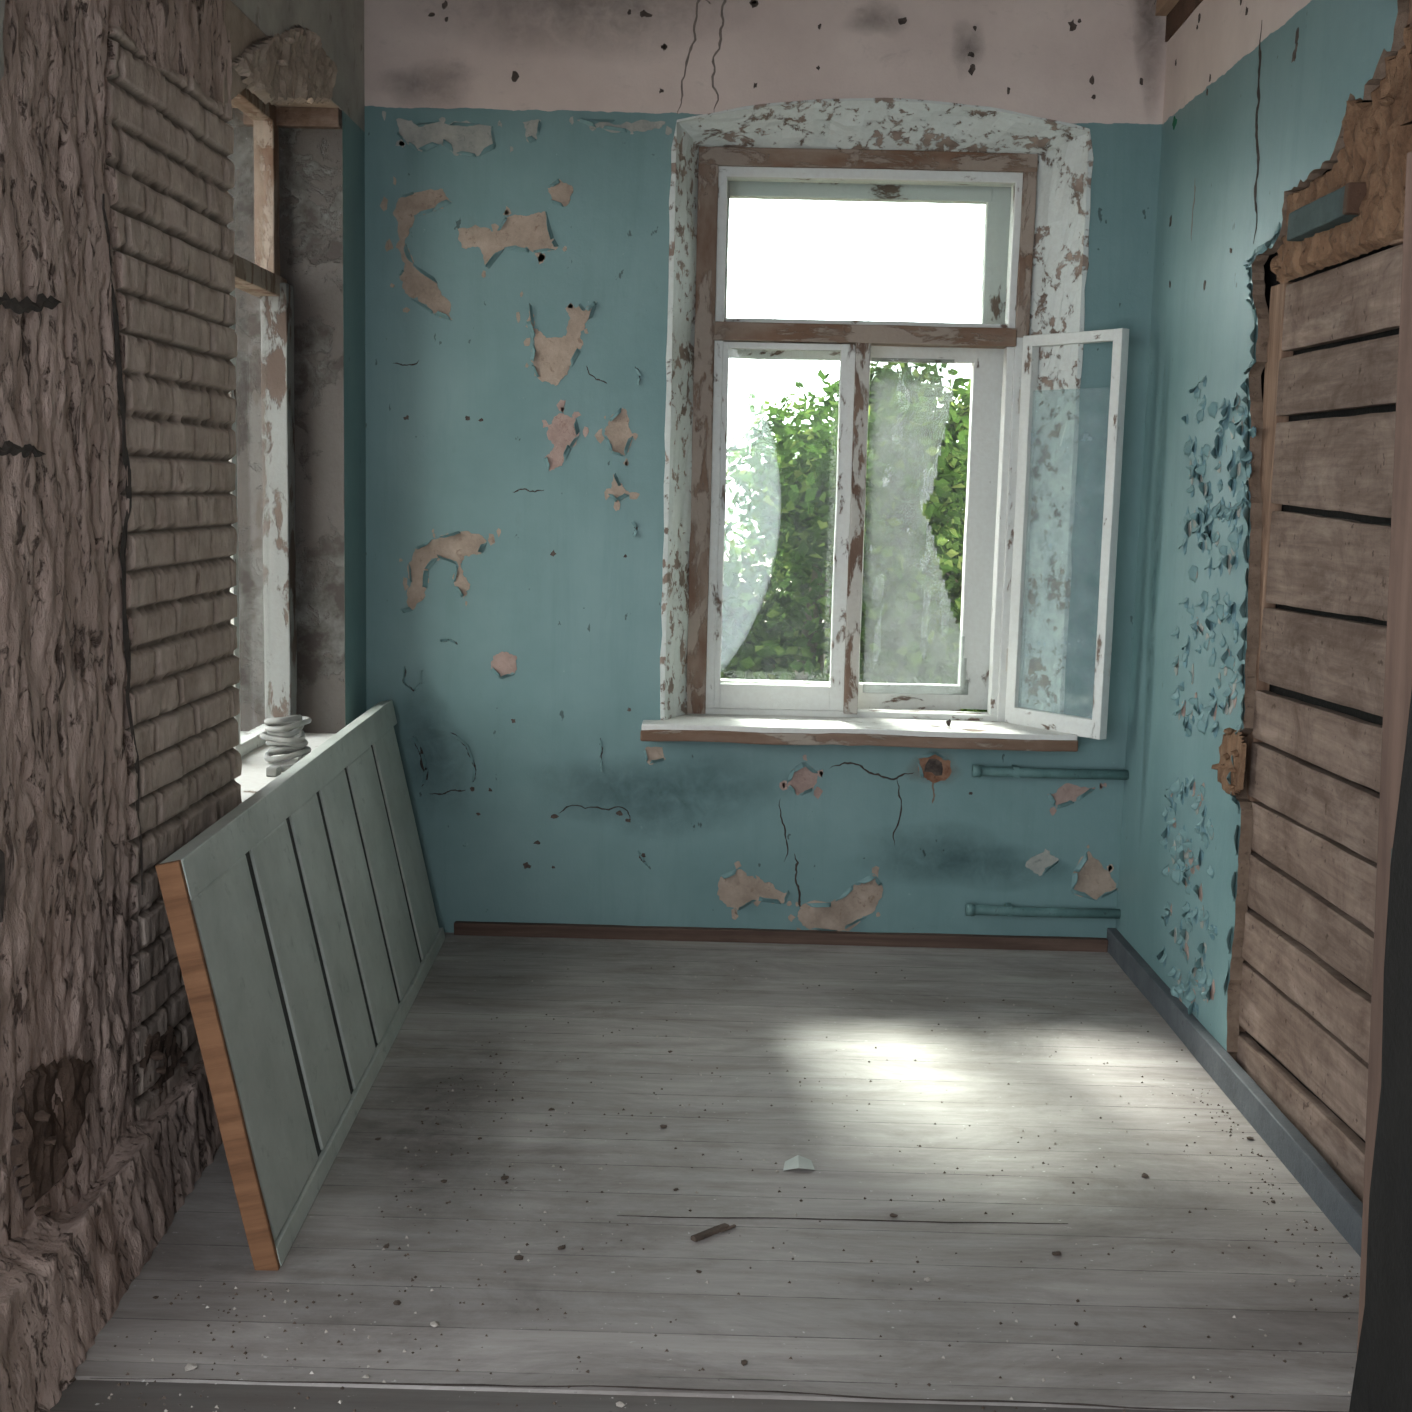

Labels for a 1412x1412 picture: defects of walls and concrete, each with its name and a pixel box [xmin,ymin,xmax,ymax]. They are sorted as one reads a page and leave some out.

crack [677,0,726,114]
peeling [382,111,541,157]
crack [1253,24,1262,244]
peeling [380,176,452,321]
peeling [458,179,573,278]
peeling [516,292,640,511]
peeling [399,528,501,613]
spalling [1156,24,1412,1018]
crack [779,801,801,907]
peeling [717,861,883,931]
crack [832,762,914,844]
peeling [1071,845,1117,901]